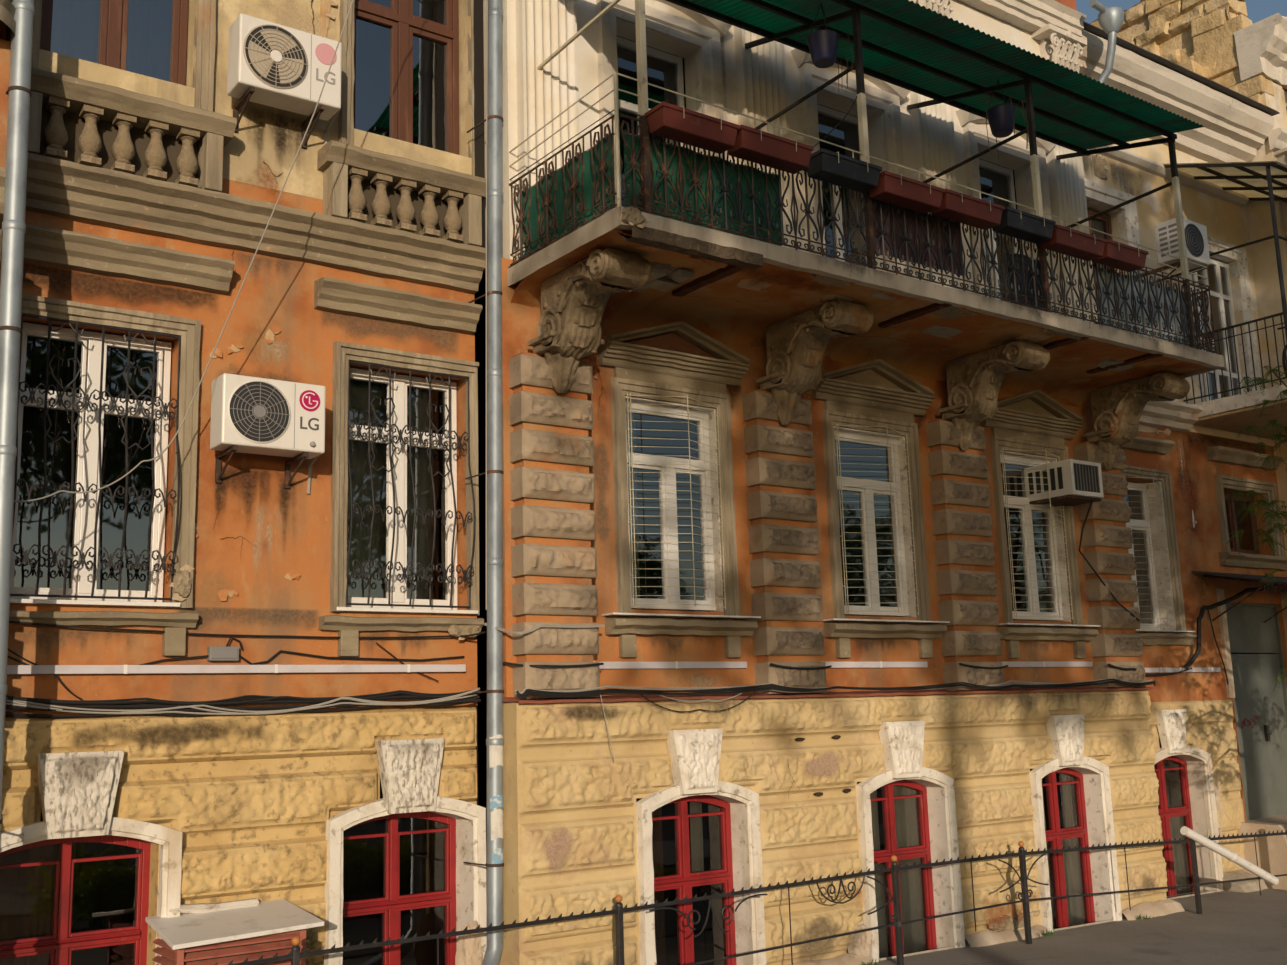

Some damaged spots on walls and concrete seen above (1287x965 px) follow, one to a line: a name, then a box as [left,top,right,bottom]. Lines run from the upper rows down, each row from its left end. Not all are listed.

damp [249,111,302,150]
damp [216,469,271,559]